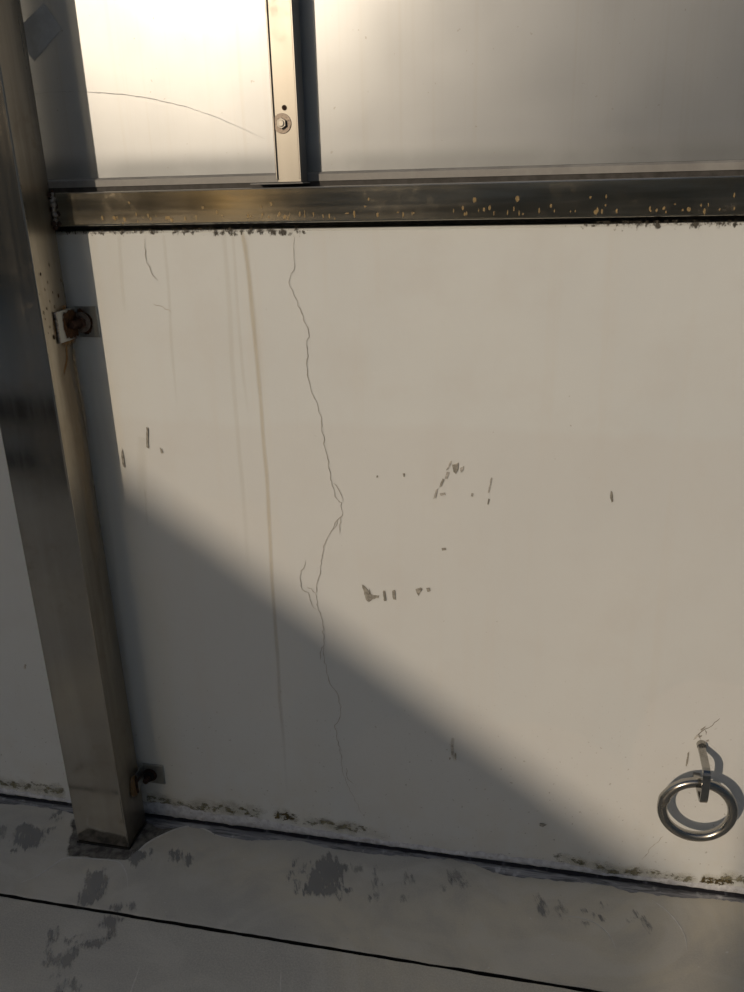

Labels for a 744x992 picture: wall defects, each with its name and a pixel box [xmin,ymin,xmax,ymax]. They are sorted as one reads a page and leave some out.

damp [584,193,741,229]
corrosion [45,291,93,374]
peeling [433,461,464,499]
crack [288,230,364,816]
peeling [362,585,396,602]
damp [68,819,182,860]